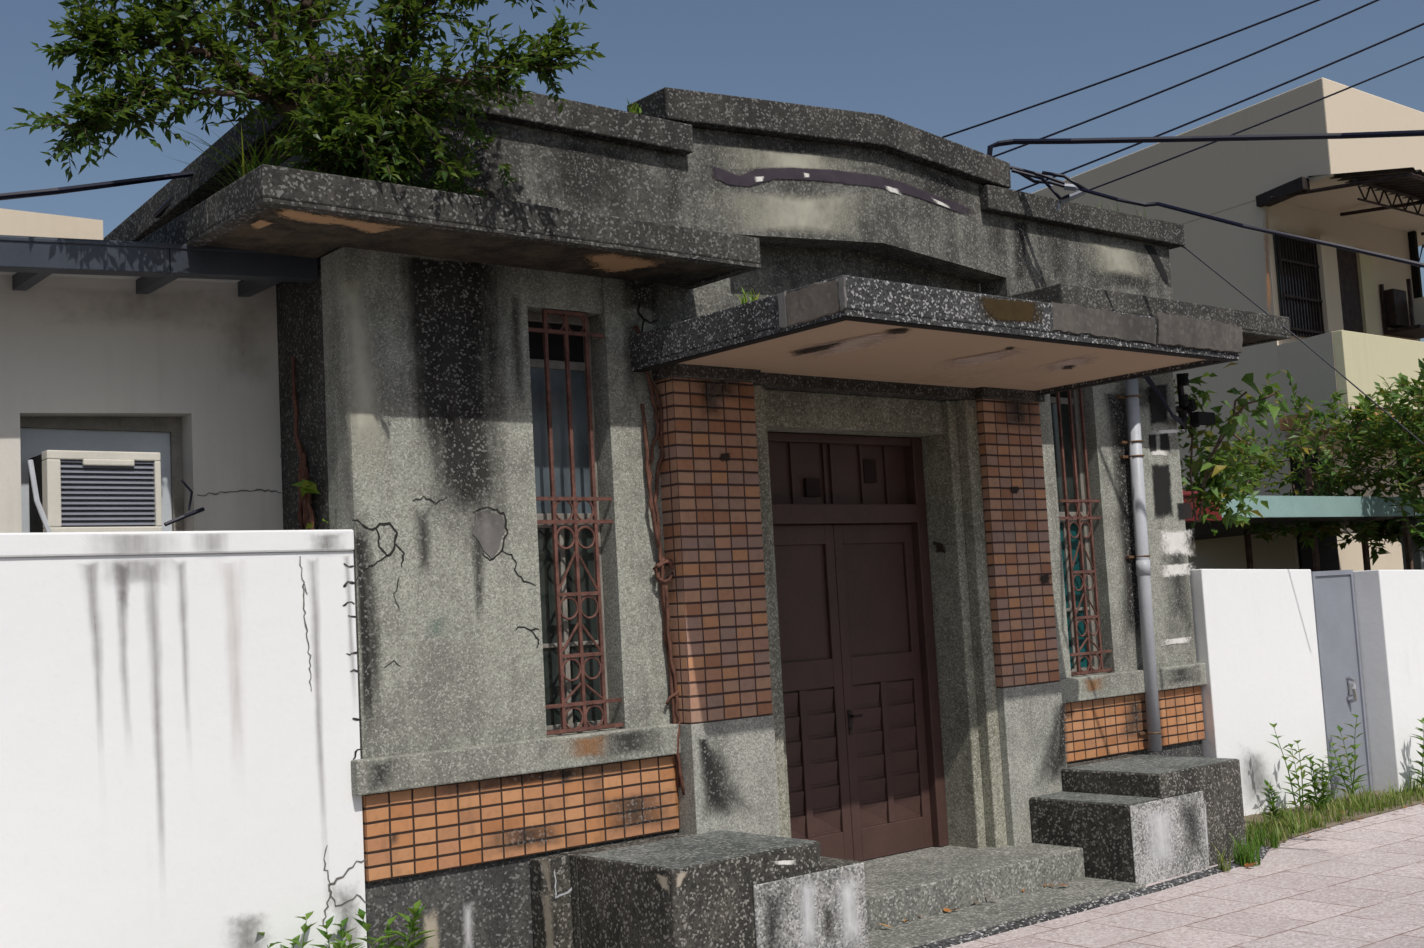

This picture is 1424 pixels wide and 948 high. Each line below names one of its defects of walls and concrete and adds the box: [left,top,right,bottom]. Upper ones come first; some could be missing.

flaking render [251,209,400,233]
water stain [411,258,520,500]
crack [343,496,447,618]
water stain [420,516,428,563]
crack [299,556,312,691]
crack [346,652,400,672]
water stain [699,739,734,806]
crack [323,845,369,925]